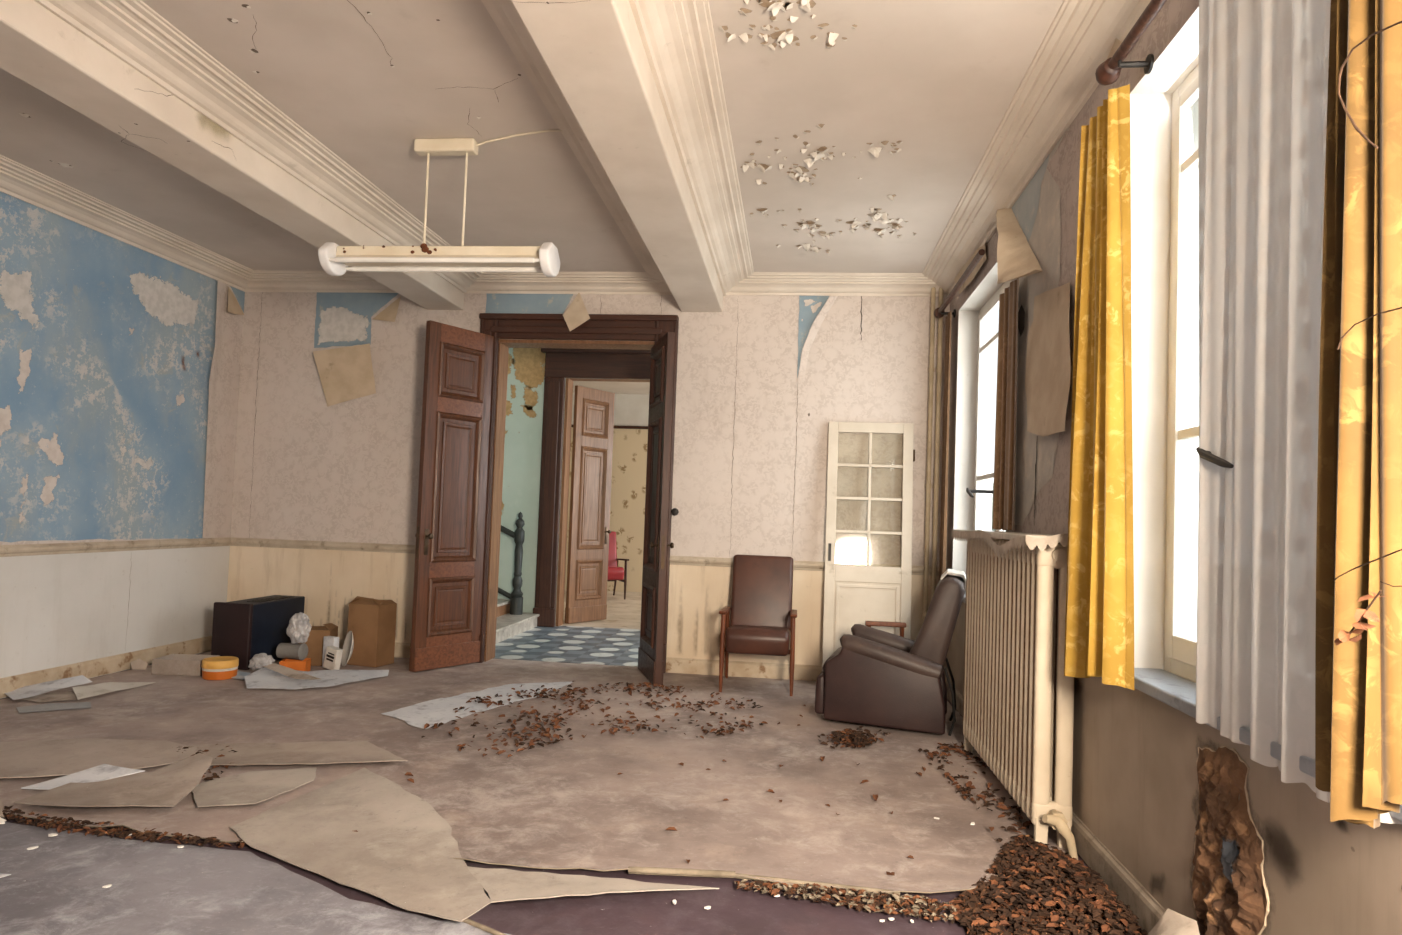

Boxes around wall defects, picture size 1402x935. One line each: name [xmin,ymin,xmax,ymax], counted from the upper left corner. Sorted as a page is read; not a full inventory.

peeling [719,0,857,51]
peeling [741,124,903,186]
peeling [748,194,917,253]
peeling [505,348,546,434]
spalling [1191,743,1271,935]